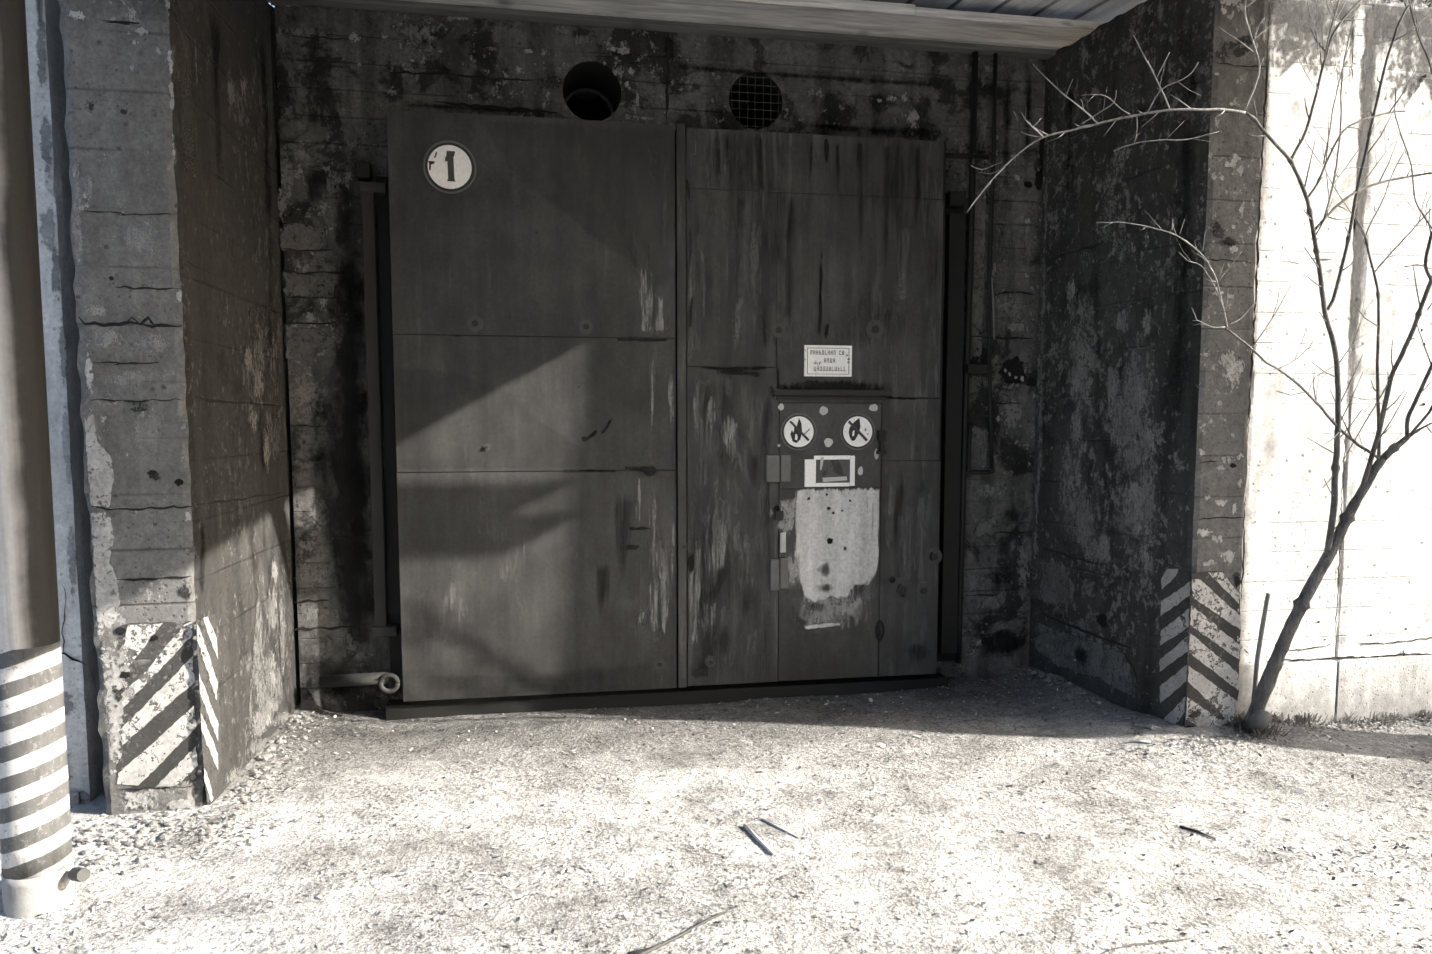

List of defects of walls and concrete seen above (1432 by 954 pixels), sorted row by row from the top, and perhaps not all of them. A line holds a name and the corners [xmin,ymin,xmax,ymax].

spalling [36,21,46,87]
spalling [40,107,52,173]
spalling [39,159,94,383]
spalling [167,50,175,110]
peeling [634,255,667,332]
leakage [681,66,931,86]
leakage [810,124,929,136]
leakage [1169,74,1198,407]
leakage [1261,0,1432,403]
peeling [62,304,197,814]
peeling [636,478,675,644]
peeling [689,373,931,666]